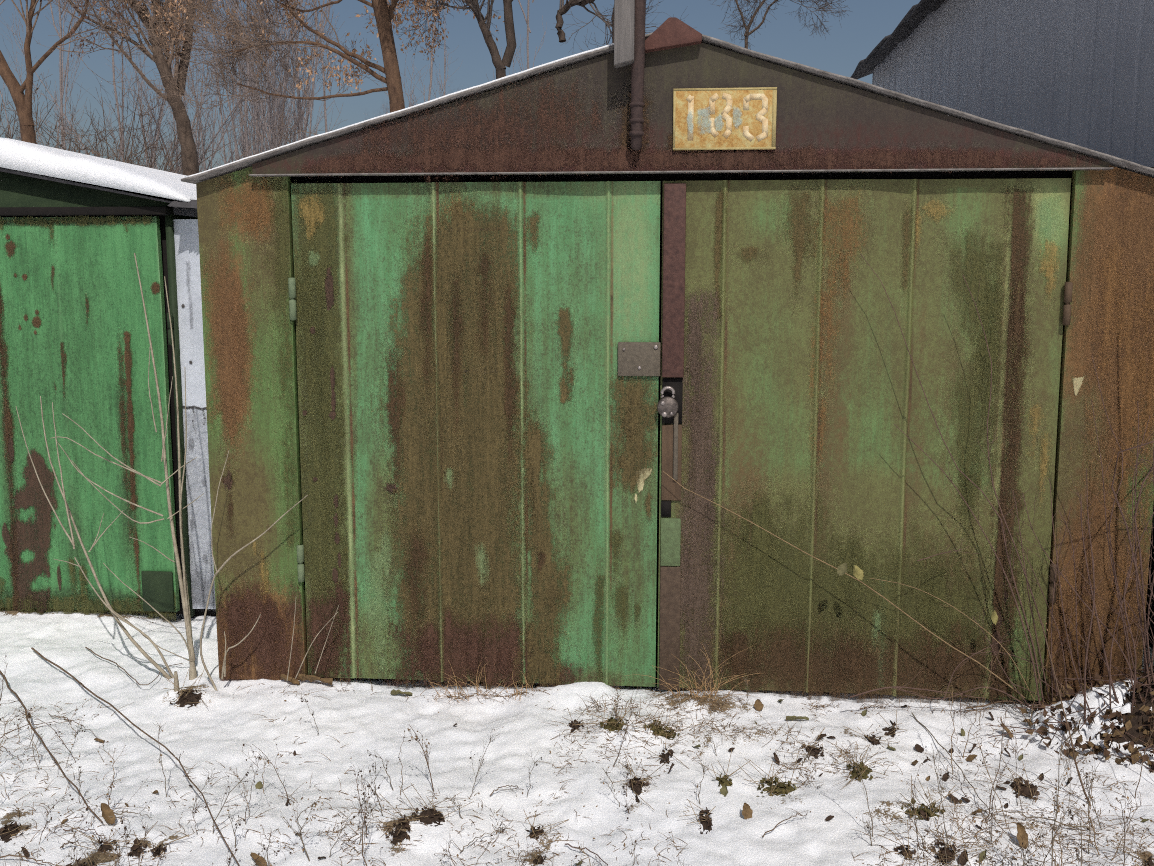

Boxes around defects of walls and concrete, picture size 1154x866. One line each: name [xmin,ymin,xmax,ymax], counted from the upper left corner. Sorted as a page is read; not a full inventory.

rust [302,84,1080,180]
rust [5,234,16,257]
rust [18,309,41,334]
rust [0,296,18,611]
rust [117,331,137,510]
rust [221,470,234,530]
rust [377,200,582,690]
rust [679,191,1057,707]
rust [129,528,141,601]
rust [215,582,361,685]